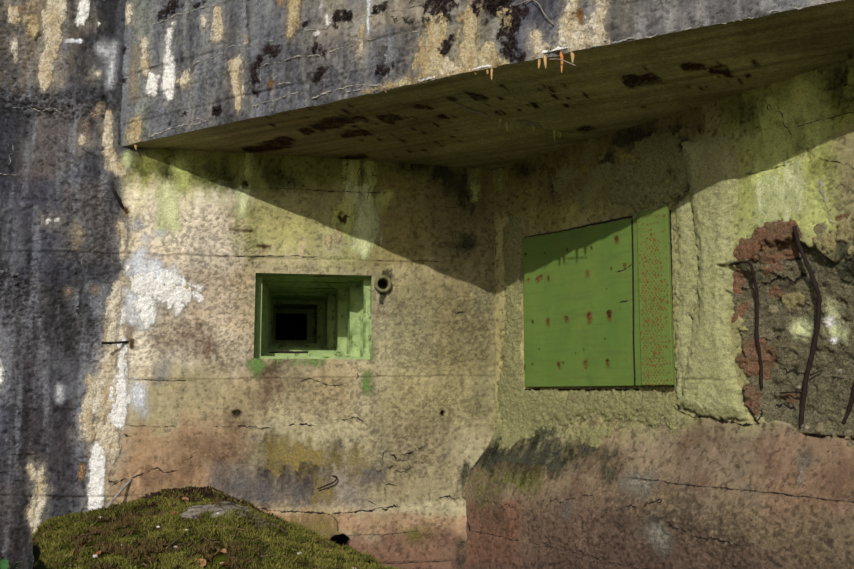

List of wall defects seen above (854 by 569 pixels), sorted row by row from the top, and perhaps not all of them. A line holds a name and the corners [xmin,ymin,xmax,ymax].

water stain [8,0,90,91]
water stain [228,0,261,111]
water stain [278,0,302,38]
water stain [360,0,512,94]
water stain [681,60,757,84]
water stain [242,105,412,186]
water stain [754,160,804,227]
water stain [79,221,204,511]
spalling [729,212,854,447]
crack [212,411,319,429]
crack [257,451,421,536]
crack [621,477,854,546]